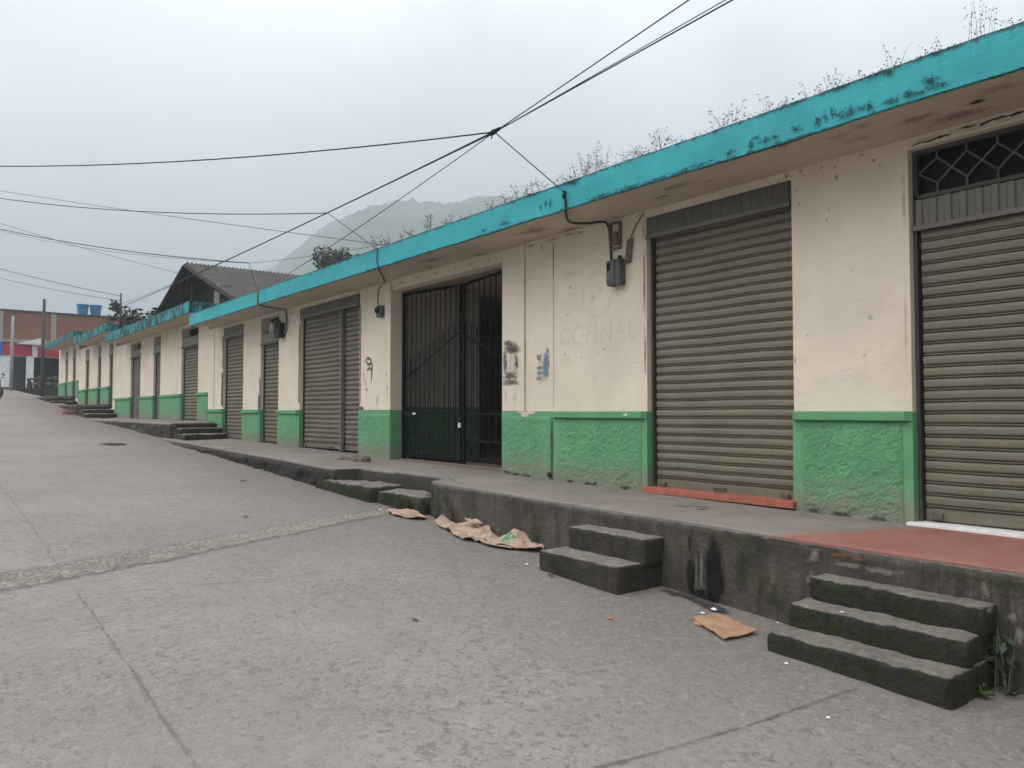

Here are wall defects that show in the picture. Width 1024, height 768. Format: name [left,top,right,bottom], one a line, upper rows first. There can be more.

leakage [825,65,900,92]
mould [814,75,947,129]
leakage [664,537,728,612]